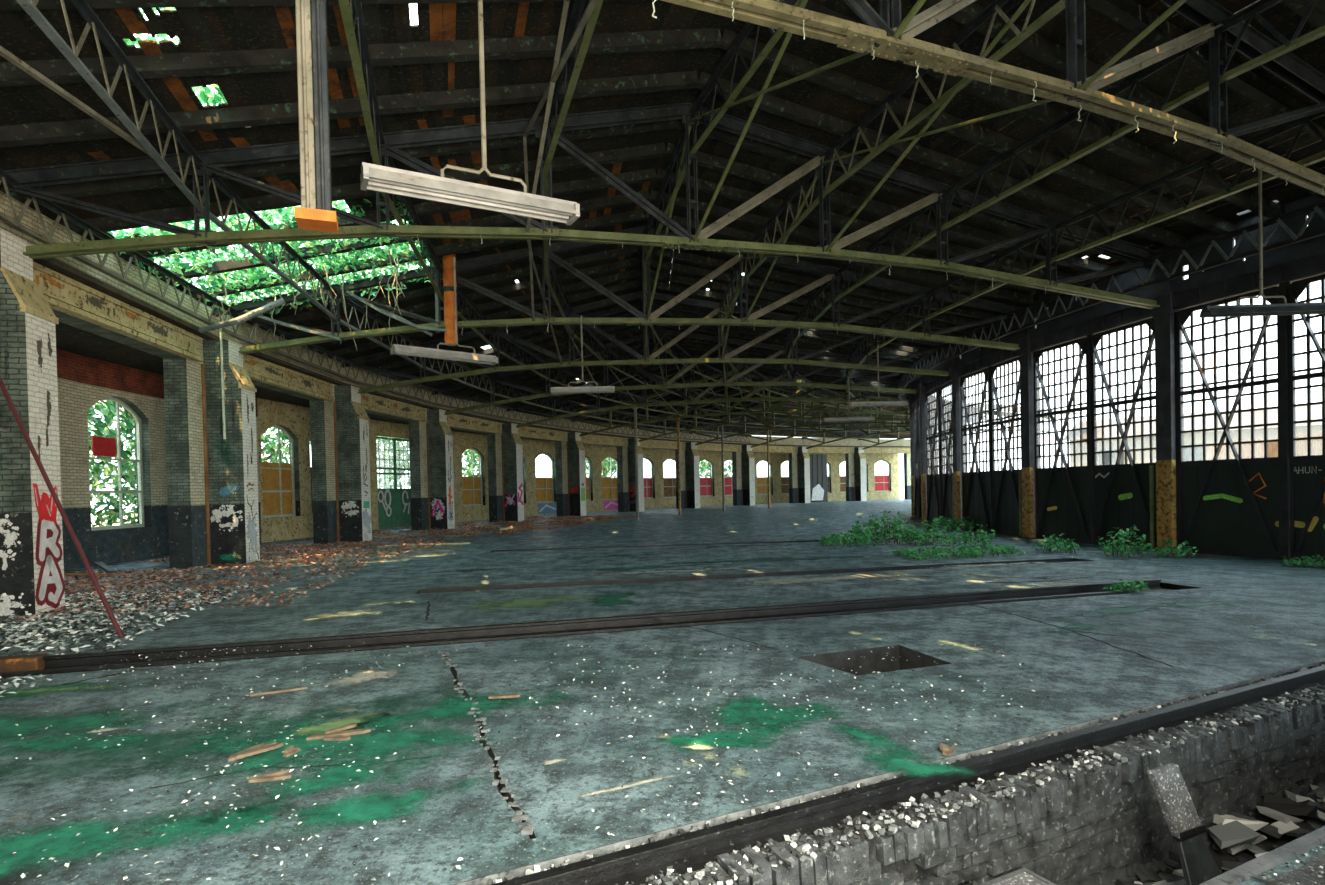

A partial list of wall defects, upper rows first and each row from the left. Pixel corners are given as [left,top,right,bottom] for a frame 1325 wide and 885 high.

peeling [0,514,21,570]
peeling [0,593,31,616]
crack [150,749,432,789]
crack [441,650,536,839]